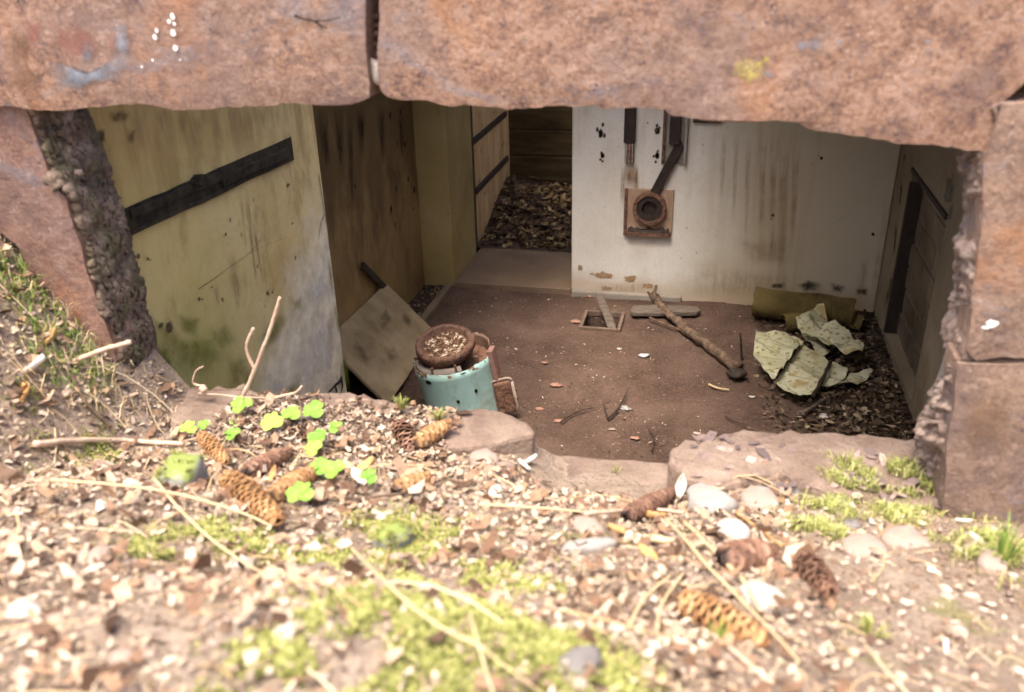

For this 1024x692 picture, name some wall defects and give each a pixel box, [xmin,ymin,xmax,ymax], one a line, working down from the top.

peeling [578,265,652,290]